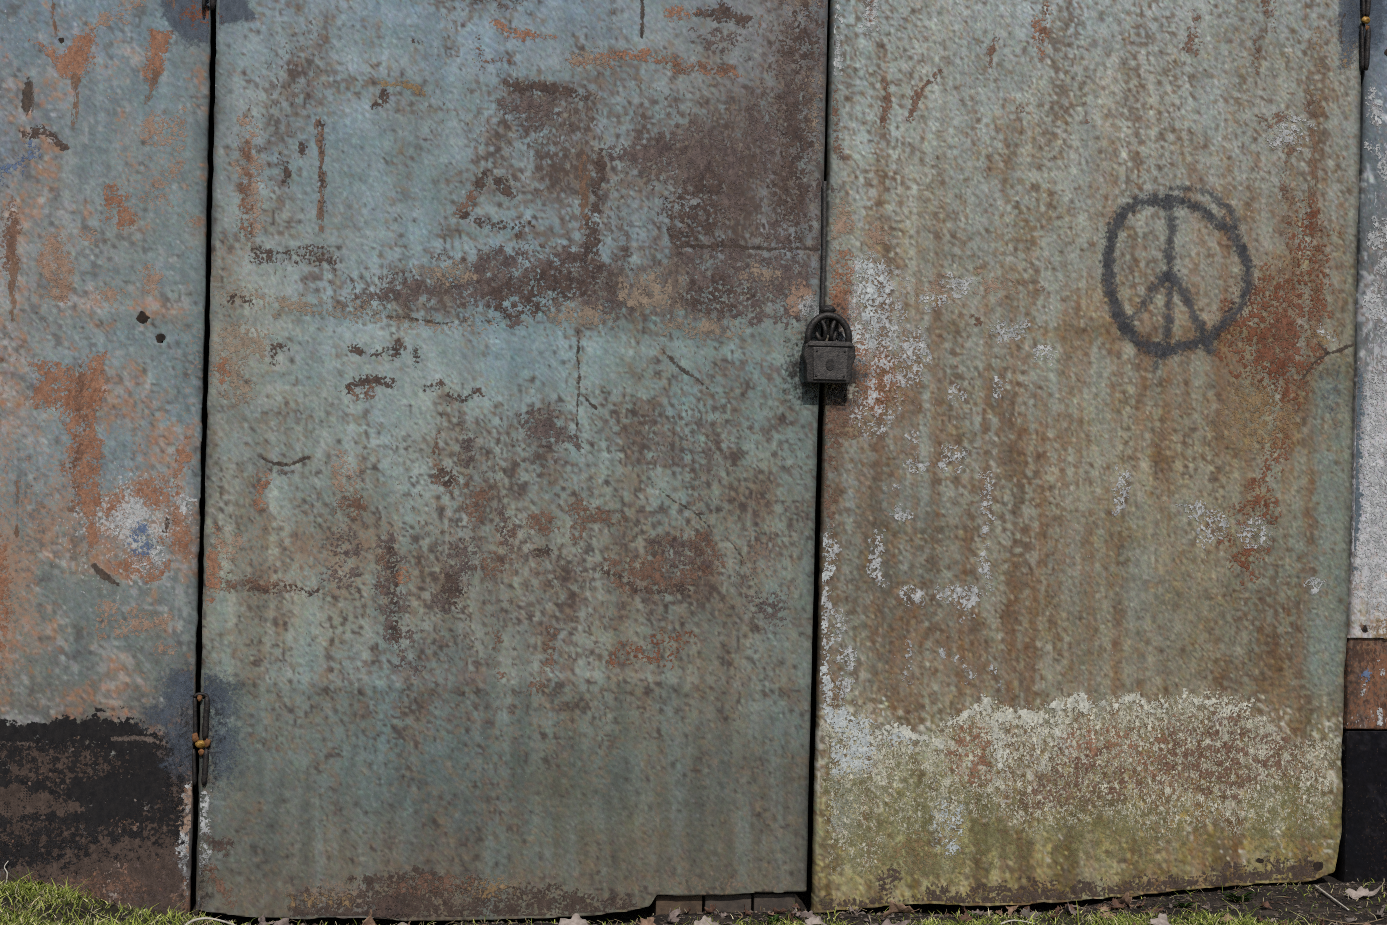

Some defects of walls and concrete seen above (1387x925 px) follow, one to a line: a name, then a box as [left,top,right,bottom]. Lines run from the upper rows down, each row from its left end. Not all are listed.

rust [28,0,146,126]
rust [0,28,200,321]
rust [210,0,844,406]
rust [906,69,943,123]
rust [1209,29,1342,589]
rust [25,351,197,583]
rust [205,450,426,680]
rust [430,426,626,614]
rust [595,529,726,598]
water stain [888,800,967,870]
water stain [1031,791,1208,868]
water stain [1233,775,1332,859]